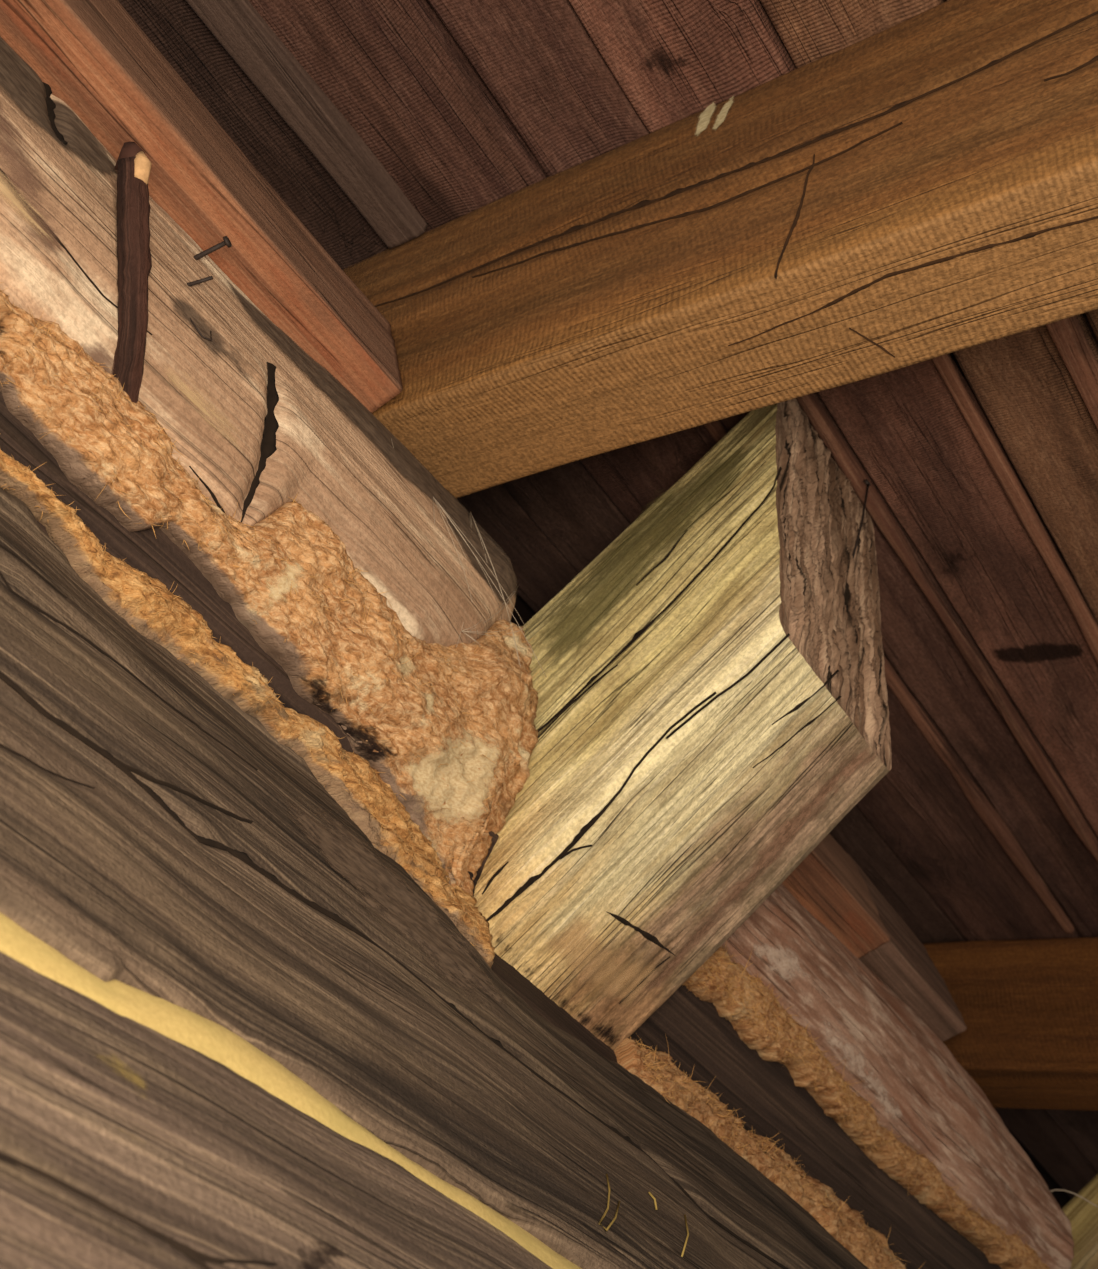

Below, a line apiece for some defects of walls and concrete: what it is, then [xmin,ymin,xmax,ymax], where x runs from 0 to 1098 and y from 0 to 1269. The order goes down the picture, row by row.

crack [375,11,1098,307]
crack [728,216,1098,358]
crack [538,467,782,738]
crack [752,669,841,768]
crack [0,633,790,1269]